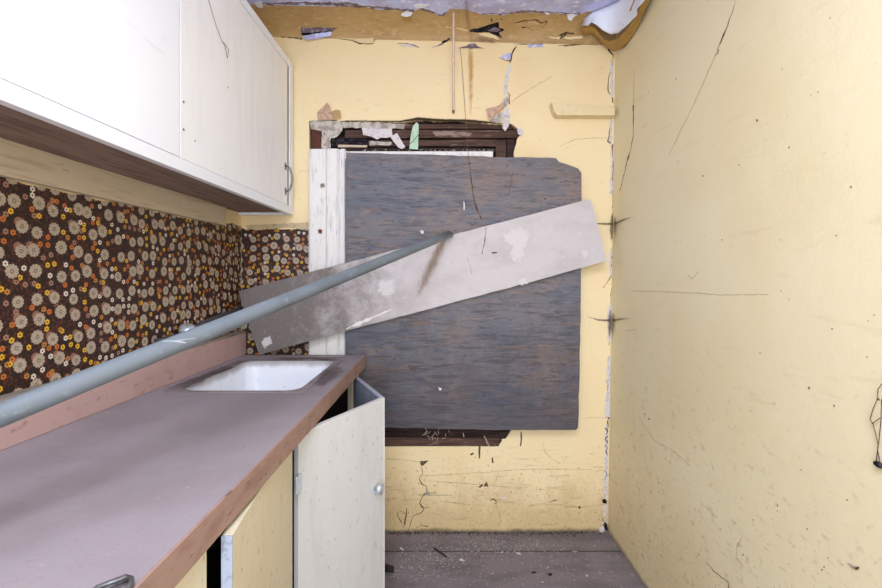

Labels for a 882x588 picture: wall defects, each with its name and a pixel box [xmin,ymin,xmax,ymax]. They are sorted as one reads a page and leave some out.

crack [341,31,375,44]
crack [398,38,481,49]
peeling [249,0,645,40]
crack [669,4,735,154]
spalling [310,102,523,157]
crack [501,43,634,207]
crack [395,248,635,532]